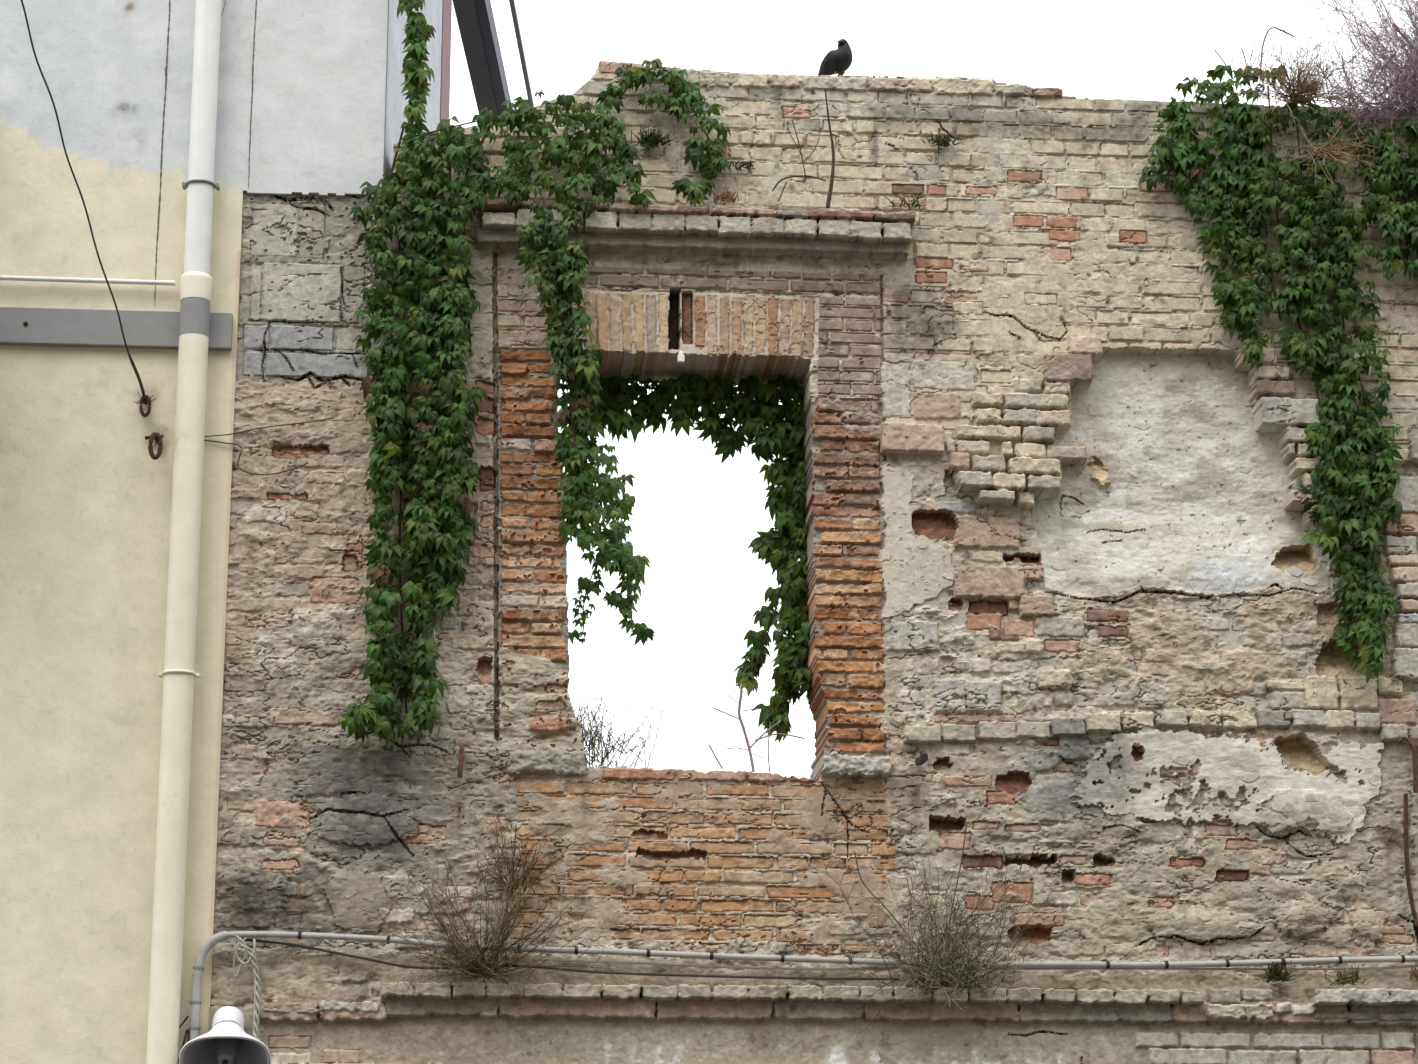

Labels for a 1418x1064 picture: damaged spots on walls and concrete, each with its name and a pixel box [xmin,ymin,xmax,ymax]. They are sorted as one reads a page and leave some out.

peeling [1002,346,1373,677]
crack [306,791,413,856]
spalling [632,828,708,863]
peeling [1071,725,1384,843]